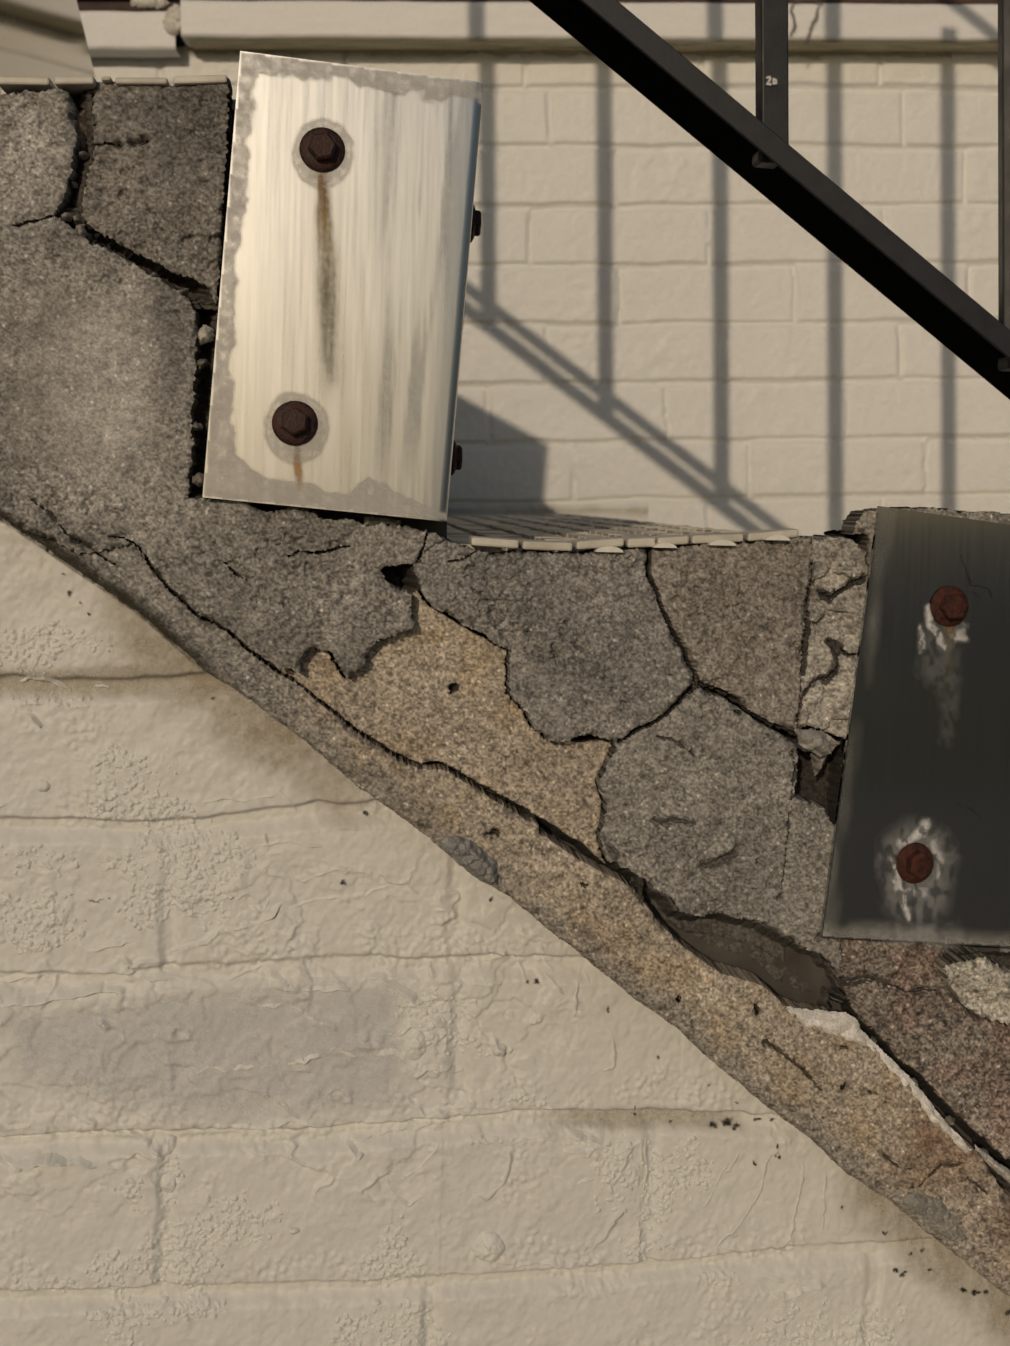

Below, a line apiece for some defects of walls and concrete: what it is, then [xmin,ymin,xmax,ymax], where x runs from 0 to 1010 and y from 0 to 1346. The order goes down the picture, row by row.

crack [15,89,220,500]
rust [319,173,330,309]
rust [294,445,302,482]
crack [31,499,644,901]
spalling [279,564,611,863]
crack [618,537,866,897]
peeling [0,963,185,1010]
crack [943,950,1010,969]
crack [762,1039,822,1090]
crack [826,974,1010,1194]
peeling [0,1152,97,1174]